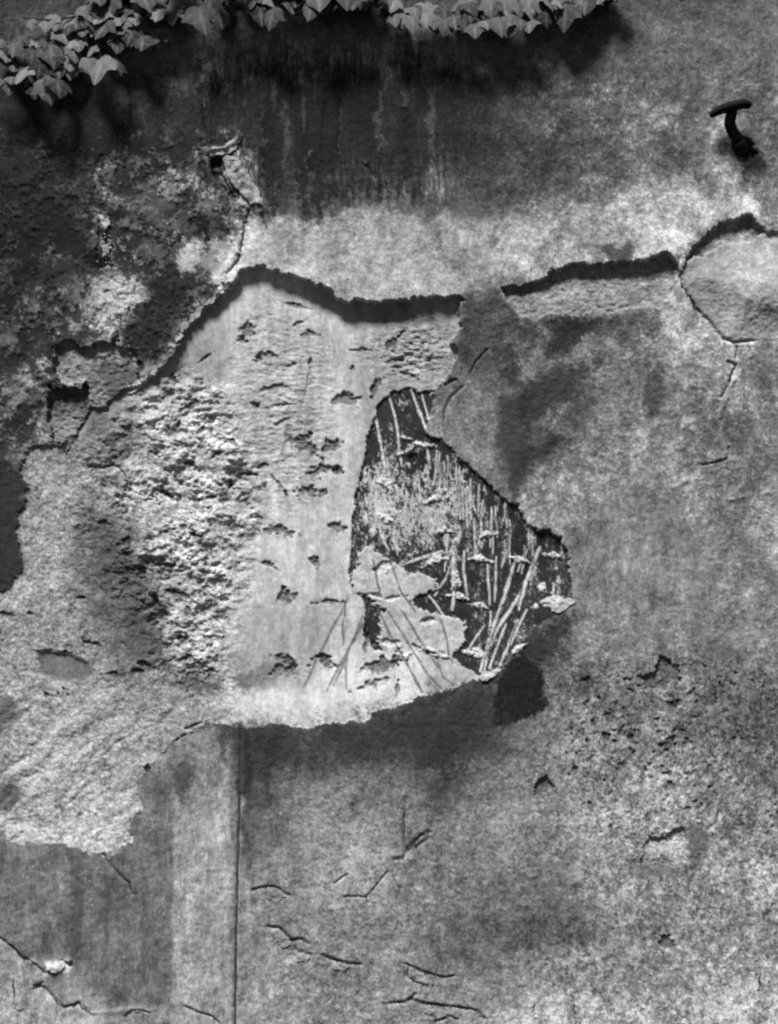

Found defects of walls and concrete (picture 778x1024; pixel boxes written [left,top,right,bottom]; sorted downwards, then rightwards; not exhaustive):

leakage [116,46,507,227]
crack [226,207,251,272]
crack [669,255,746,395]
leakage [496,314,602,490]
flaking render [0,265,576,858]
crack [364,807,429,902]
crack [3,940,88,1012]
crack [272,927,354,964]
crack [395,964,484,1020]